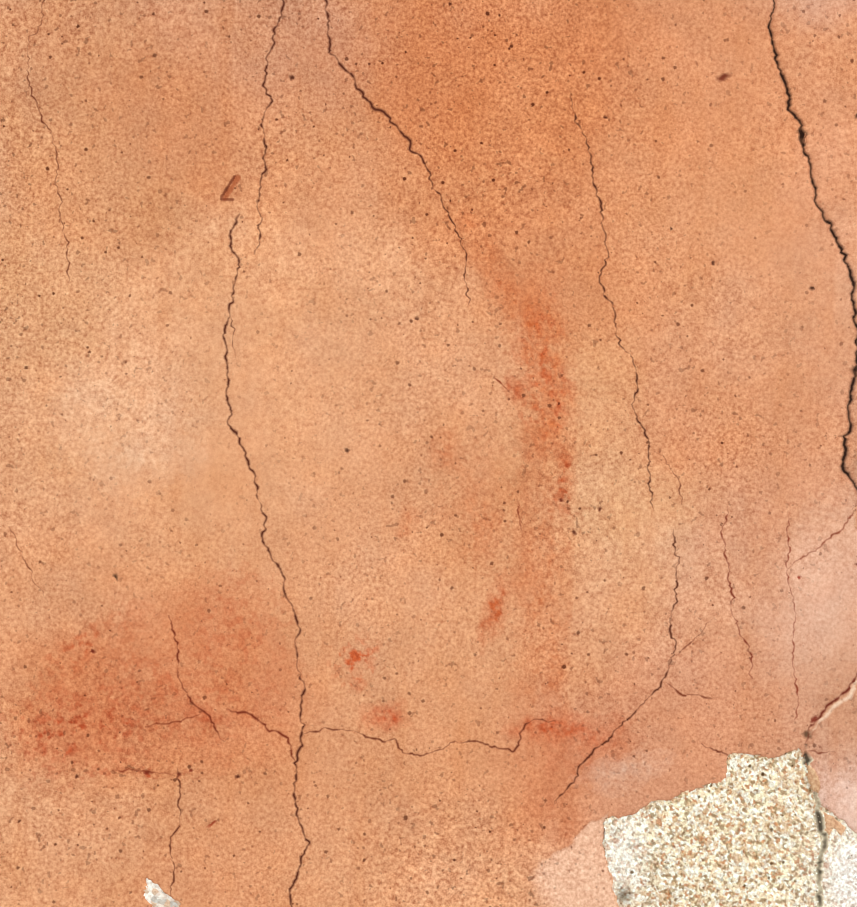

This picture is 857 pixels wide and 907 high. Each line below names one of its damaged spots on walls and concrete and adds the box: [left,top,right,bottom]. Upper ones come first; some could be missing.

flaking render [144,878,180,907]
crack [145,0,556,907]
crack [569,92,683,511]
crack [553,506,754,807]
flaking render [528,748,857,907]
crack [766,0,857,907]